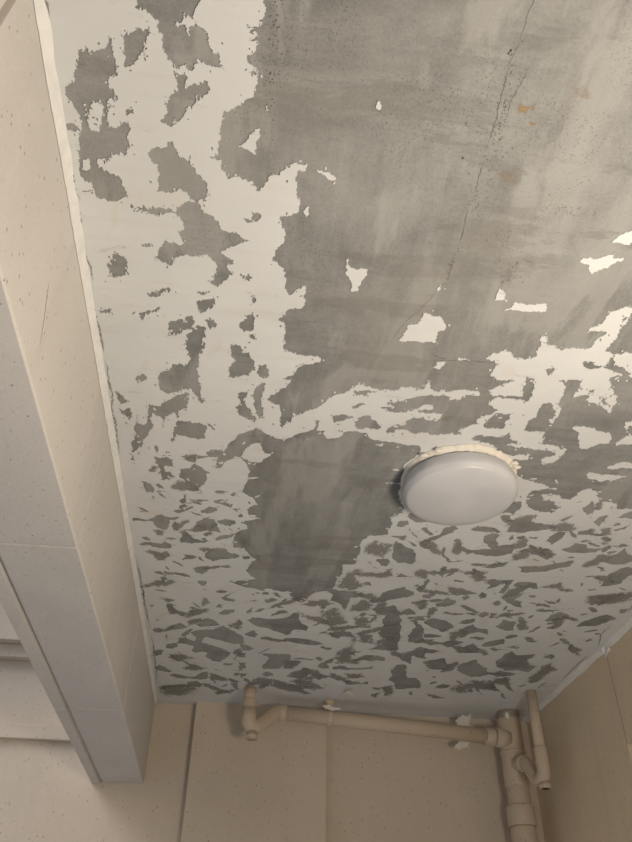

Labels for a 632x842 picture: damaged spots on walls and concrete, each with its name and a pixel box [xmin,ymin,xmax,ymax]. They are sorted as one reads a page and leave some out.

peeling [65,0,632,699]
crack [475,0,534,190]